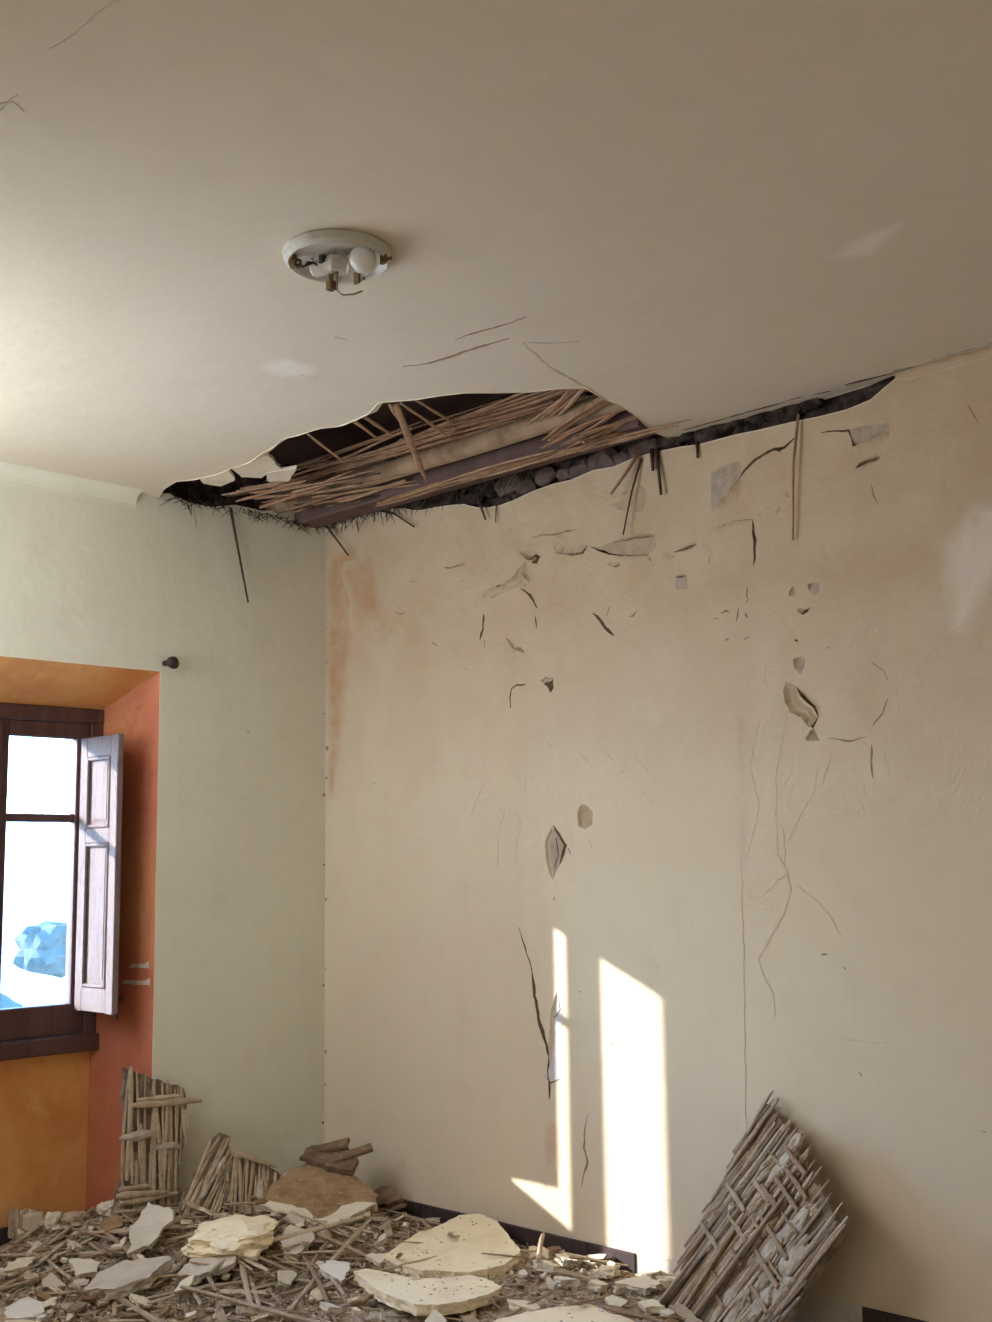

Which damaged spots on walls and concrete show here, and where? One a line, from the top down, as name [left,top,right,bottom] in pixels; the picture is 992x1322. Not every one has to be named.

crack [403,316,587,388]
crack [740,438,794,477]
peeling [821,423,890,469]
crack [531,529,577,550]
crack [593,607,637,636]
crack [713,592,766,685]
peeling [783,657,820,741]
spalling [545,825,567,879]
spalling [577,805,593,829]
crack [741,661,888,1130]
crack [518,927,551,1099]
crack [581,1116,589,1187]